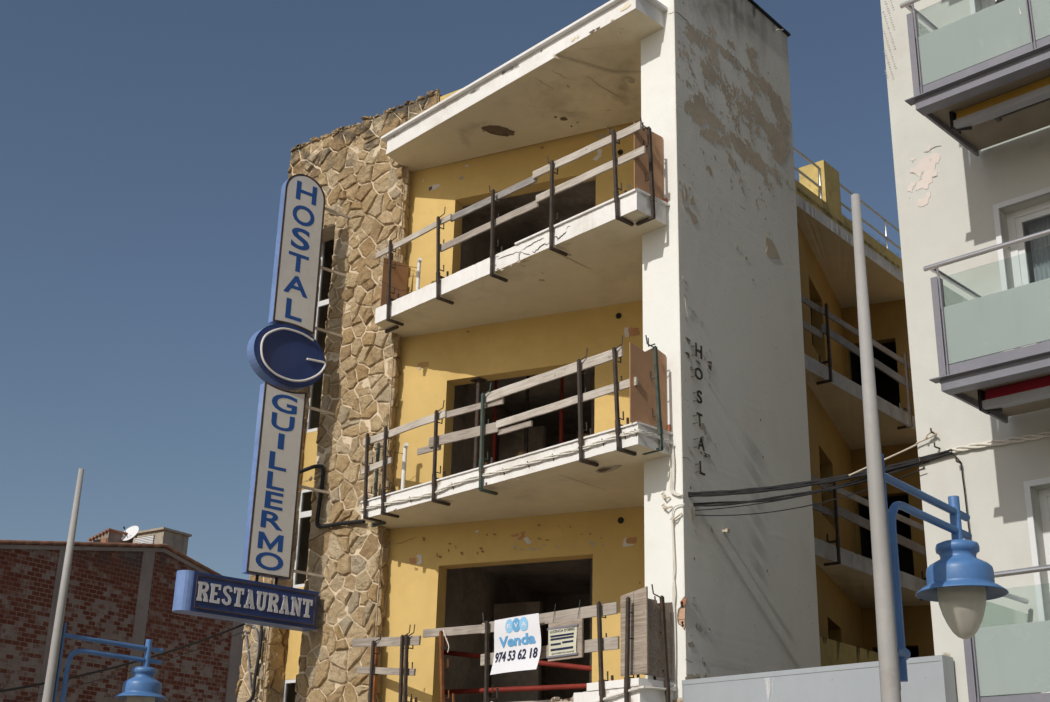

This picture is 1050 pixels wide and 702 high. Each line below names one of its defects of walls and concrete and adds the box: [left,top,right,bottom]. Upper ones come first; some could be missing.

spalling [481,125,515,138]
peeling [676,19,793,258]